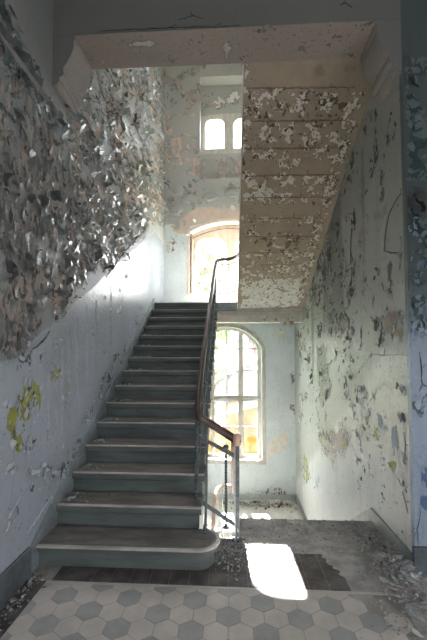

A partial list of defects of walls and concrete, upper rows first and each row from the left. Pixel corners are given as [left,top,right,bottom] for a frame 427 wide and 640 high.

peeling [0,0,427,503]